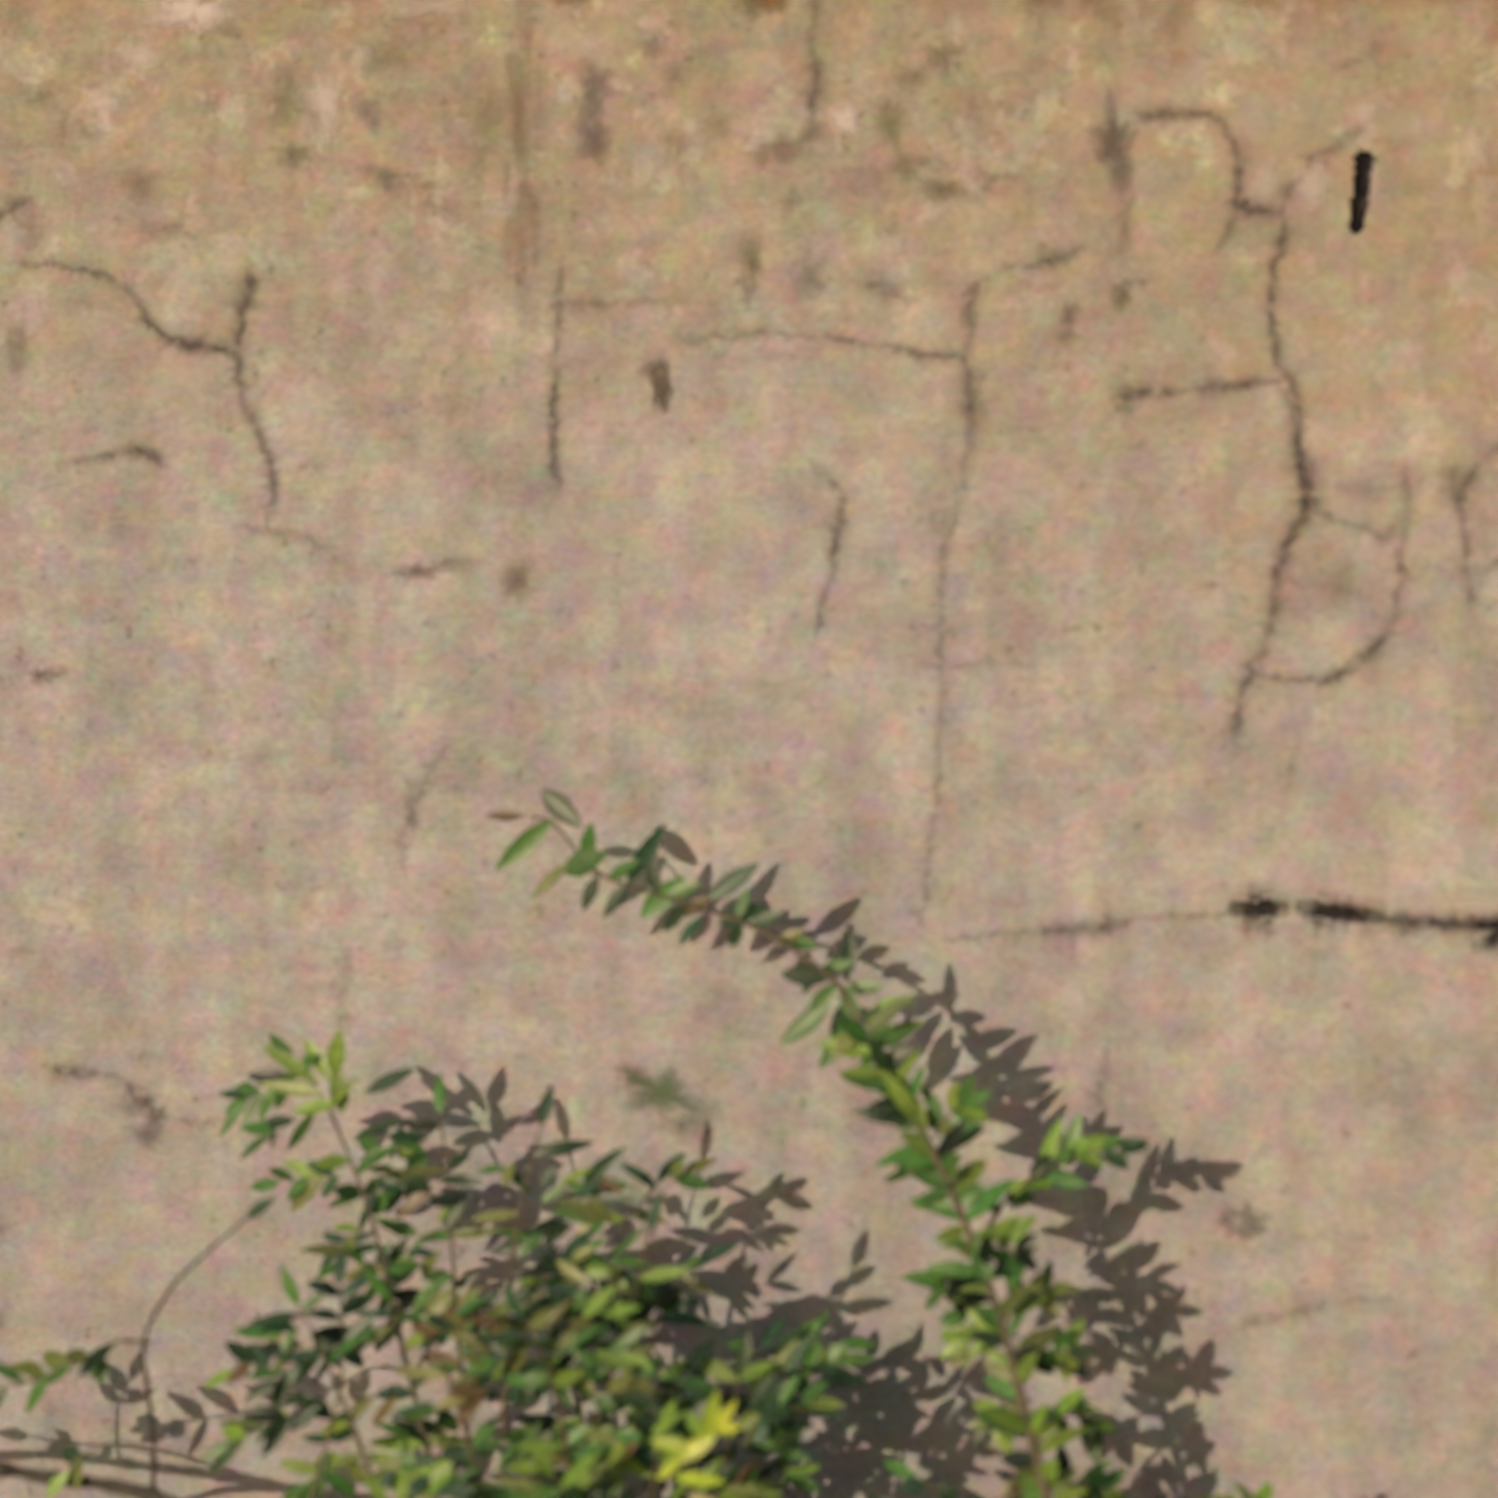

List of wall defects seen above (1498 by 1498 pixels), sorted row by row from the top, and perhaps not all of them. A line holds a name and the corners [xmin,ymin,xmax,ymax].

crack [180,327,243,372]
crack [1123,389,1169,399]
crack [1221,381,1251,390]
crack [1269,235,1313,613]
crack [1240,896,1498,947]